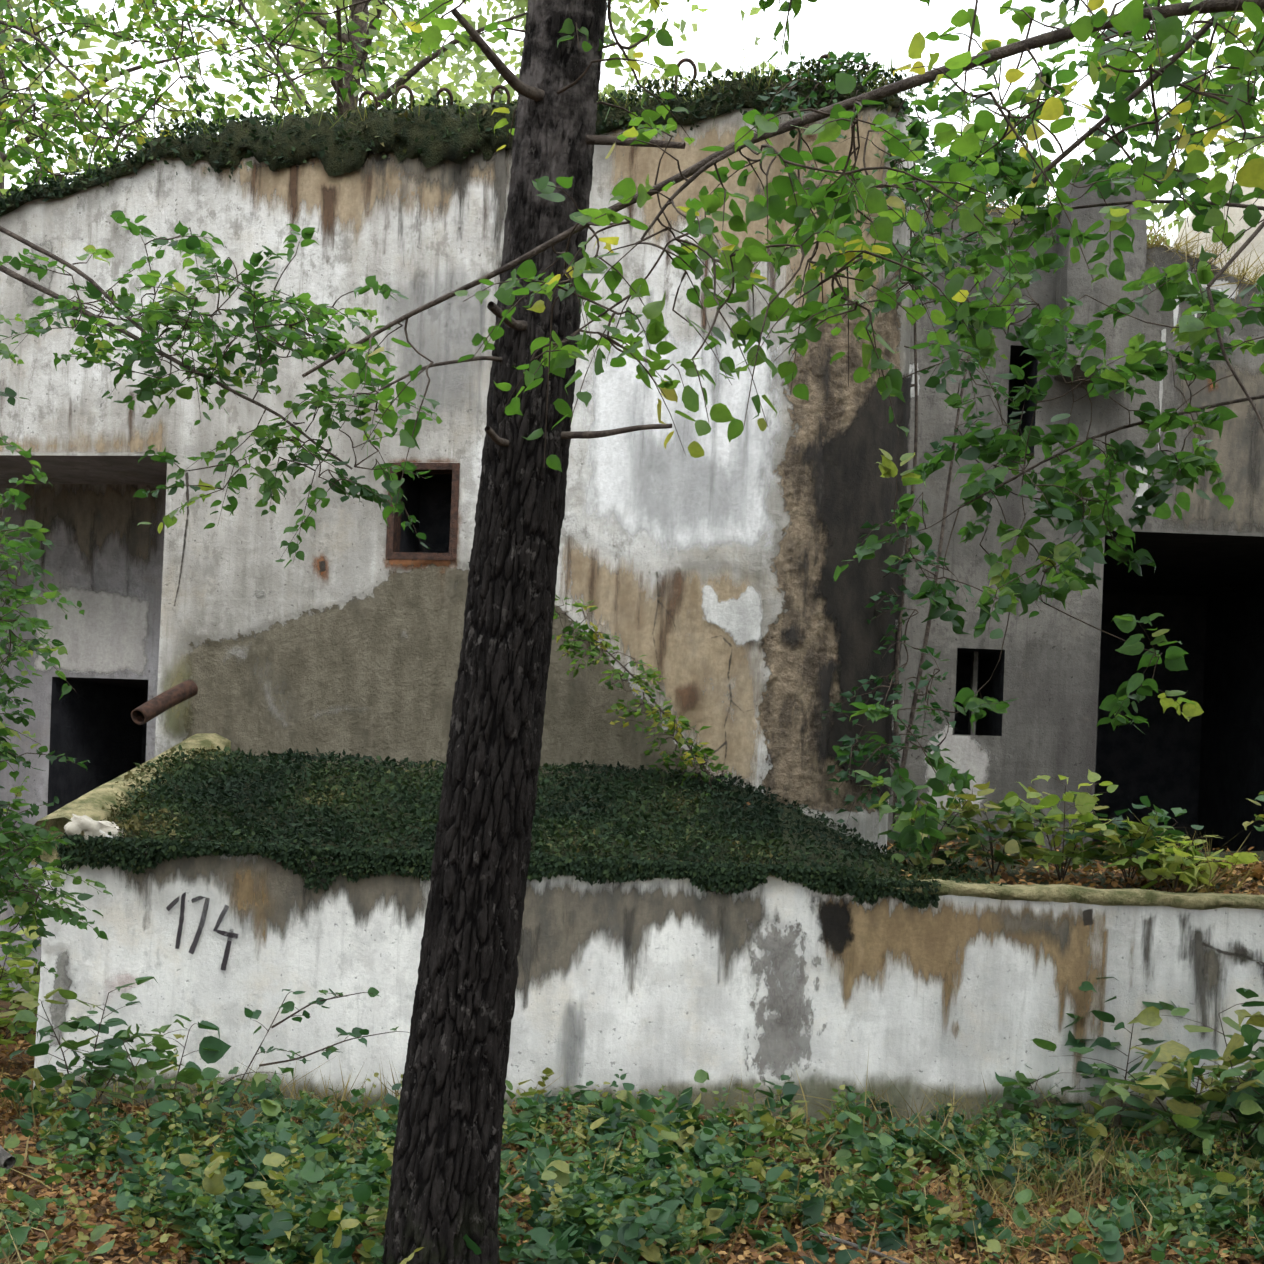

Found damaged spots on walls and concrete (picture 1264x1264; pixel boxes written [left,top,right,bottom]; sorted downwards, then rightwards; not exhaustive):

water stain [201,148,509,268]
rust [314,555,328,579]
spalling [540,270,902,814]
peeling [183,562,469,772]
water stain [112,841,428,938]
water stain [516,881,777,1008]
water stain [812,894,1107,1075]
water stain [1131,916,1152,968]
water stain [1180,915,1264,1045]